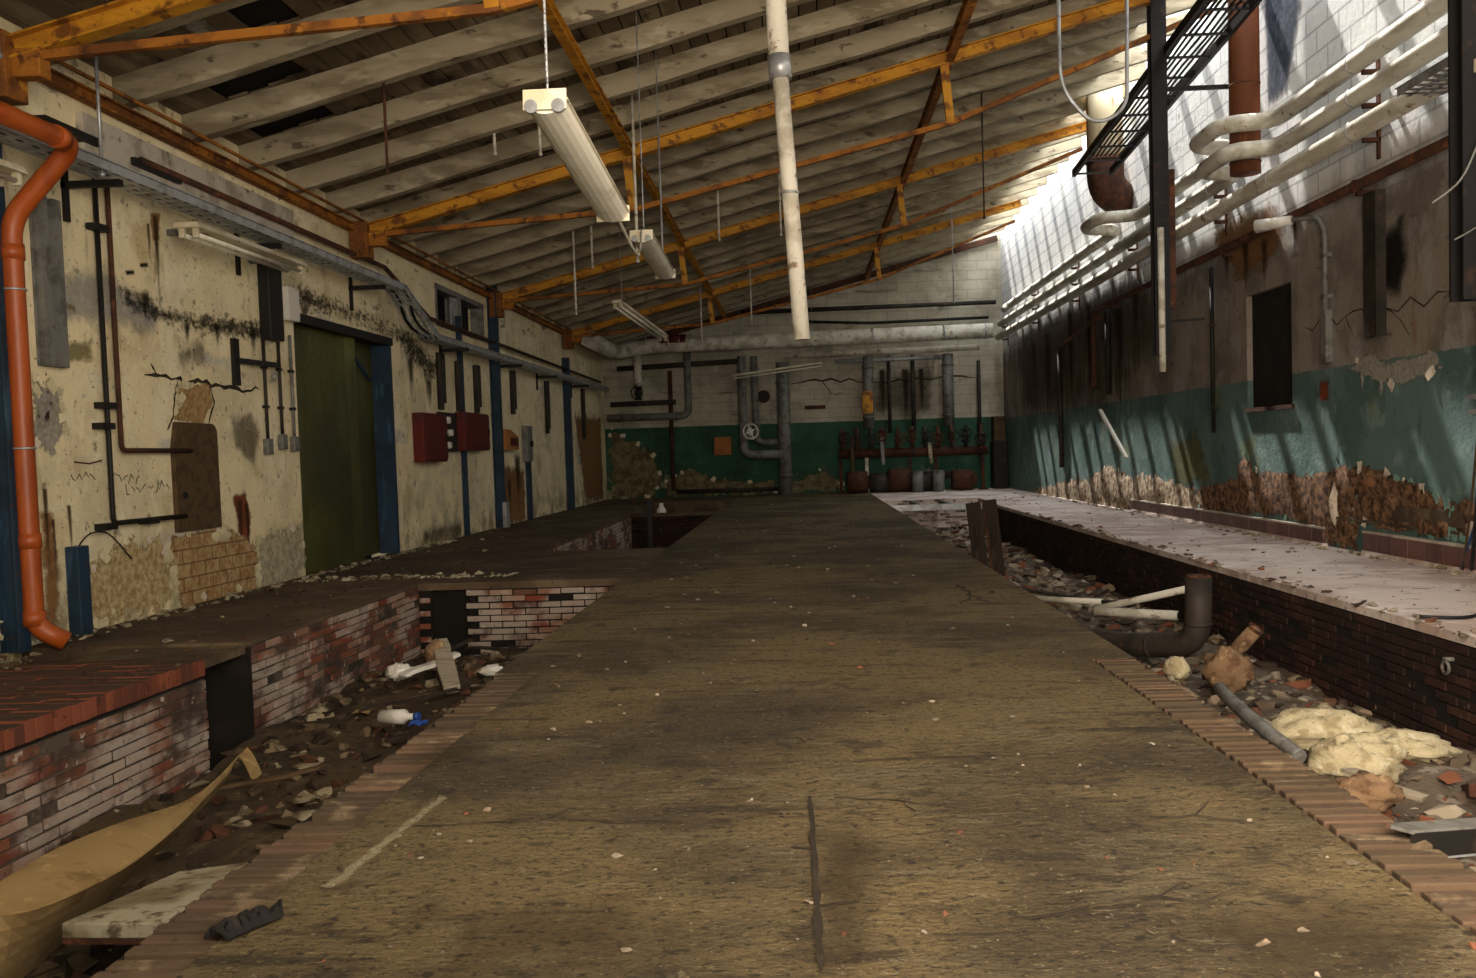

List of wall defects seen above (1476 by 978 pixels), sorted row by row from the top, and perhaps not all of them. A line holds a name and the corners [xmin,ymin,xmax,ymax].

water stain [120,289,261,345]
peeling [1348,350,1443,392]
spalling [1026,451,1475,550]
peeling [90,520,306,627]
spalling [997,508,1476,752]
crack [413,796,1016,971]